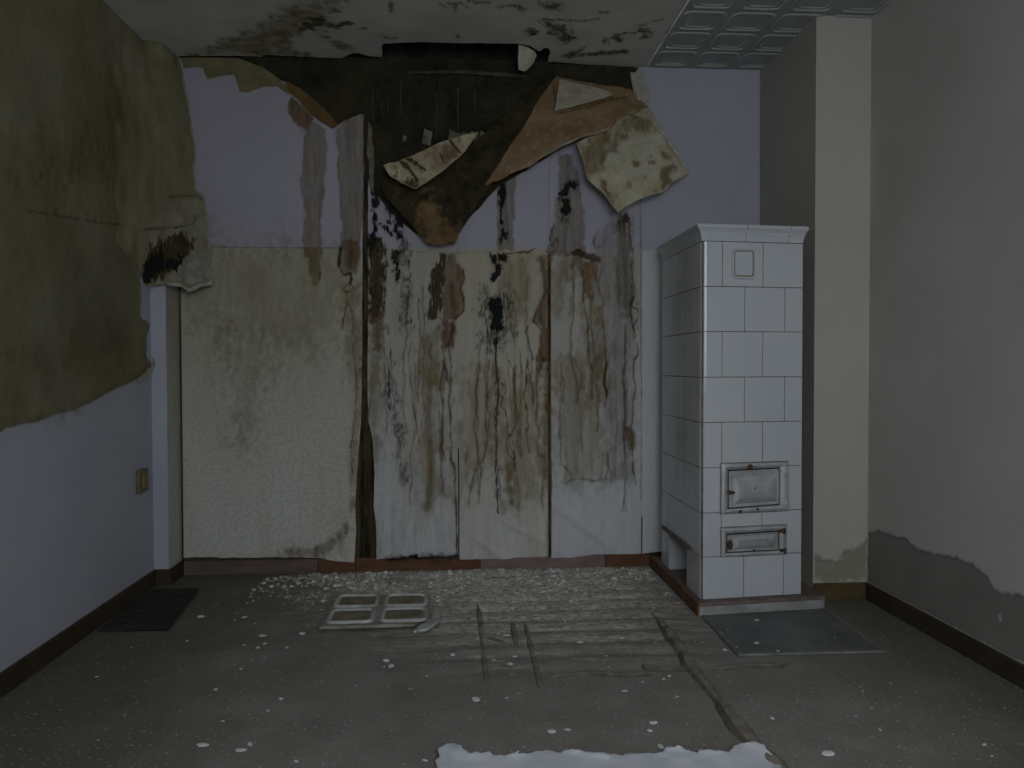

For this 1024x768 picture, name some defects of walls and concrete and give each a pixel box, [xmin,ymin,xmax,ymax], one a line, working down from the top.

damp [195,0,367,56]
mould [525,0,664,68]
flaking render [0,0,155,432]
spalling [178,55,634,237]
damp [547,154,602,303]
damp [616,210,636,330]
damp [471,177,534,514]
damp [623,349,639,470]